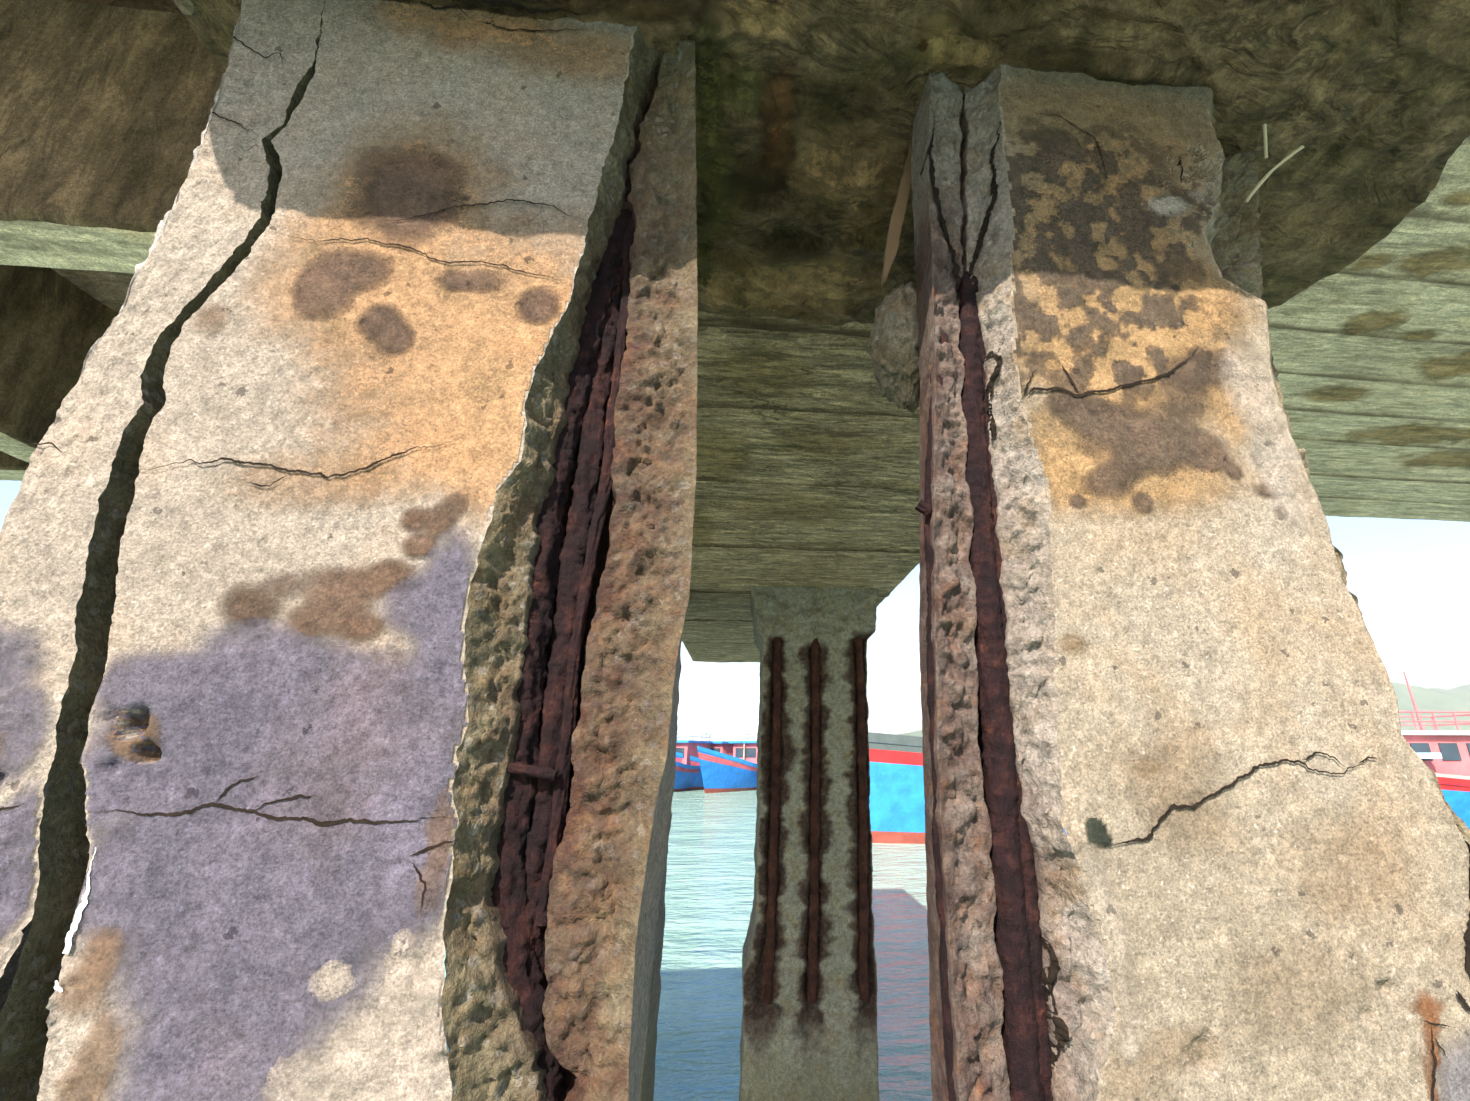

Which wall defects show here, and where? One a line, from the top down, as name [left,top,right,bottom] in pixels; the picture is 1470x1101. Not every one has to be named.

damp [384,0,694,72]
crack [0,0,597,1101]
damp [63,132,573,1101]
spalling [441,27,698,1101]
corrosion [763,637,782,1005]
corrosion [807,638,821,1003]
spalling [911,64,1117,1101]
crack [984,343,1201,441]
damp [1004,102,1301,518]
crack [1107,751,1381,846]
corrosion [1416,994,1441,1101]
crack [1426,814,1470,1101]